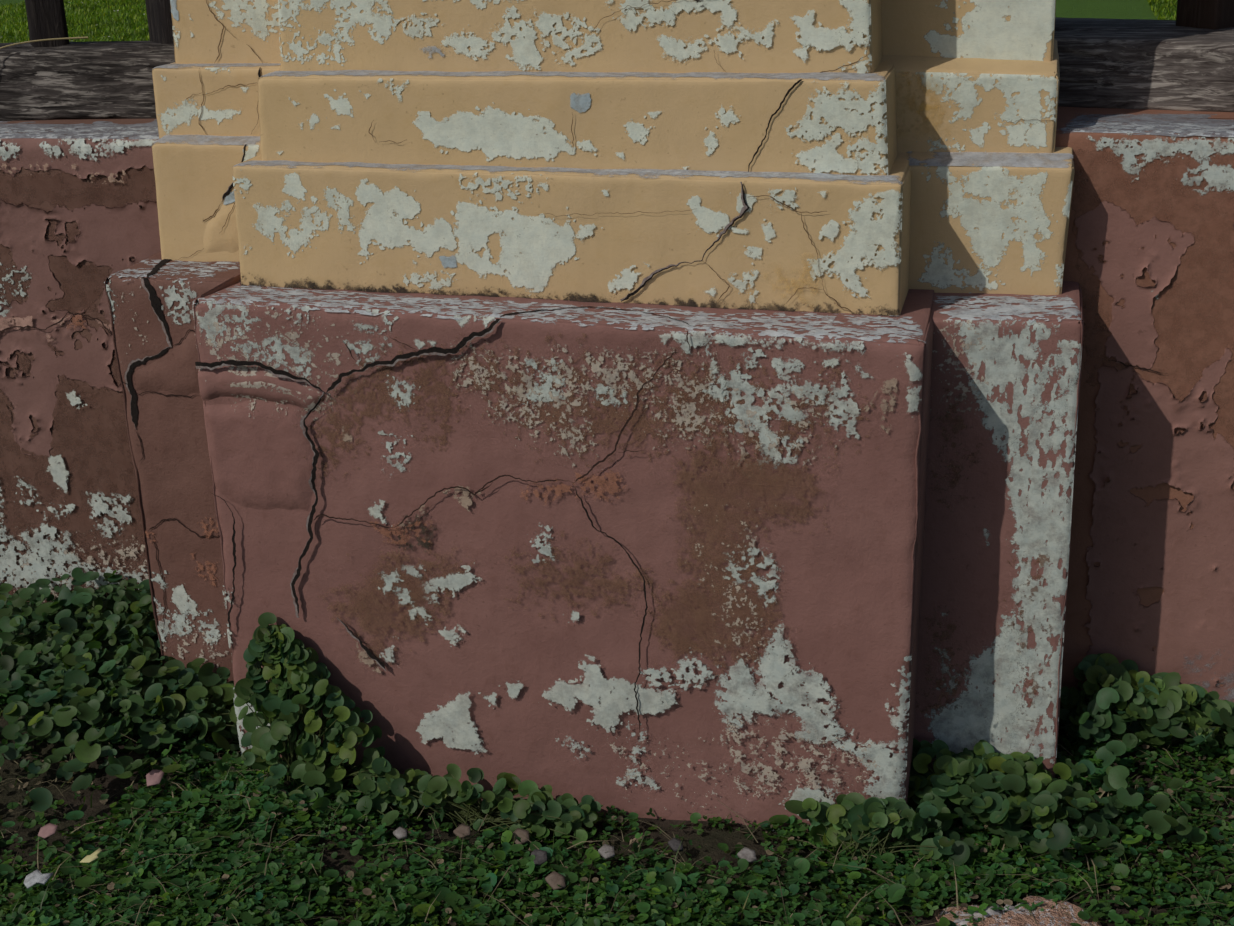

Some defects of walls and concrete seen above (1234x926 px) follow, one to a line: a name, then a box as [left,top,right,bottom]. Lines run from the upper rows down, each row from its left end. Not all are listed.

peeling [923,0,1055,61]
peeling [0,0,926,673]
crack [121,0,870,733]
peeling [907,72,1234,764]
peeling [146,769,164,787]
peeling [233,687,270,755]
peeling [416,680,523,755]
peeling [542,624,912,836]